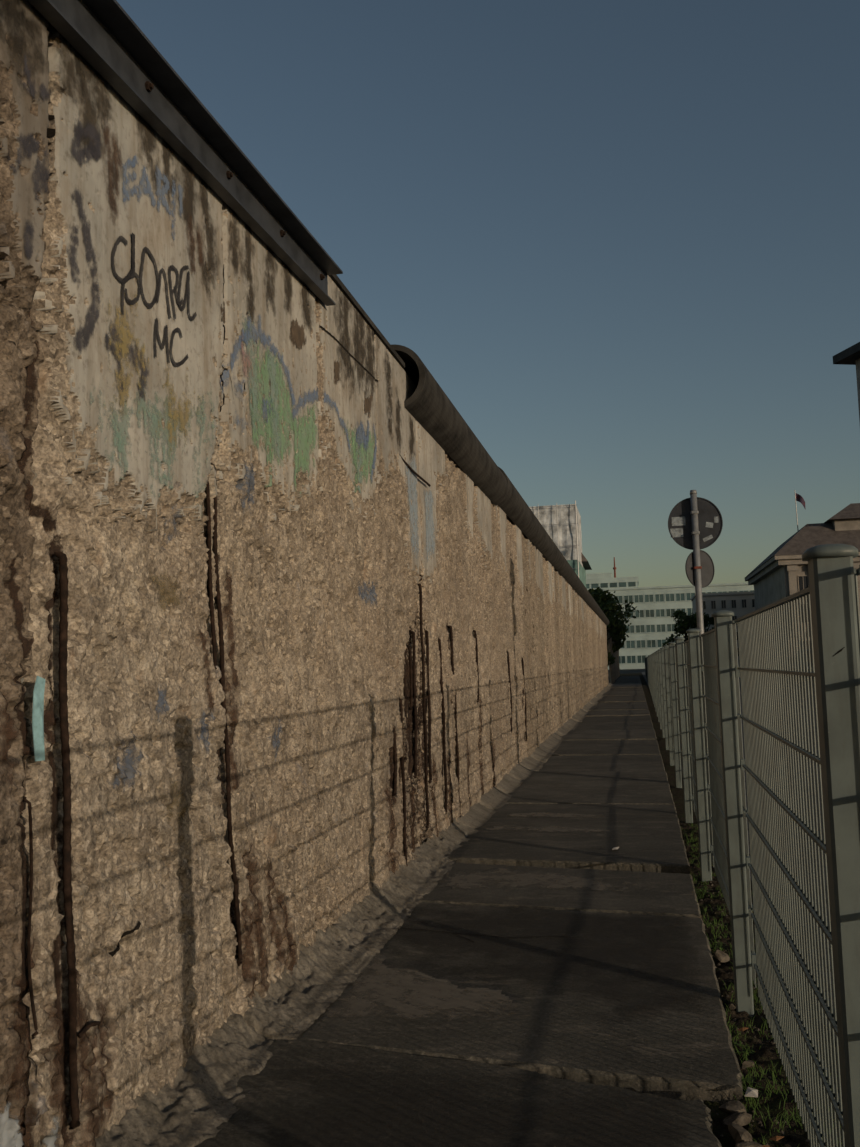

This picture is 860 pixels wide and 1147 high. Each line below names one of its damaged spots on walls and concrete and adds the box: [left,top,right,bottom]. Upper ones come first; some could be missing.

spalling [31,6,62,54]
spalling [0,60,620,1147]